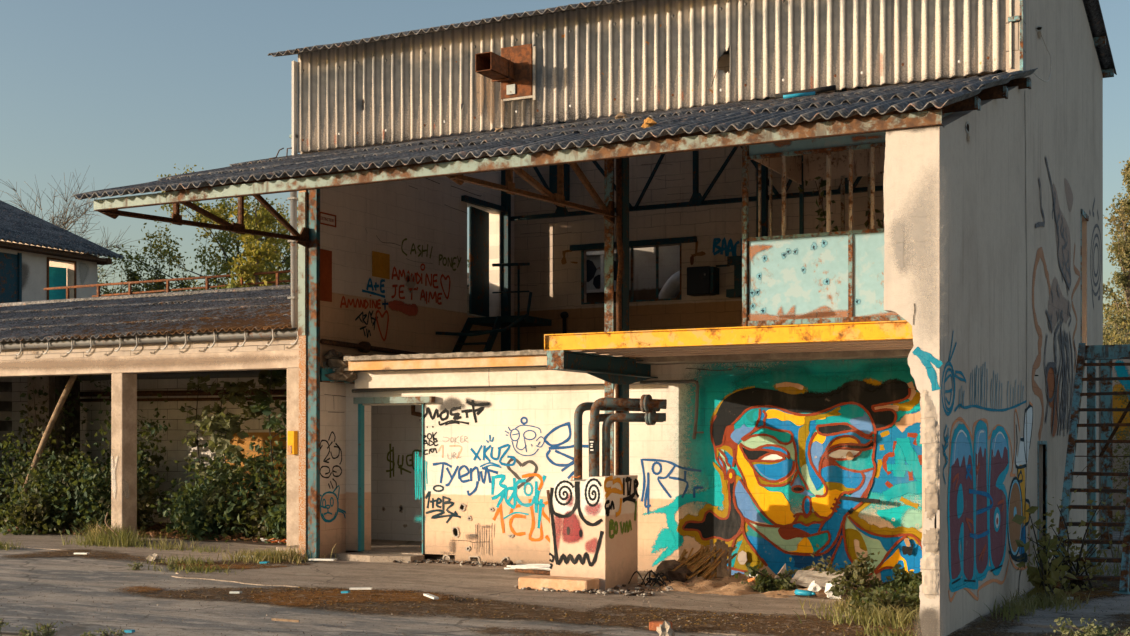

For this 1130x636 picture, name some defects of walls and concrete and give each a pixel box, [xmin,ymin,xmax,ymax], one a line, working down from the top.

rust [476,73,494,122]
rust [748,245,772,261]
rust [747,306,848,321]
spalling [902,390,939,599]